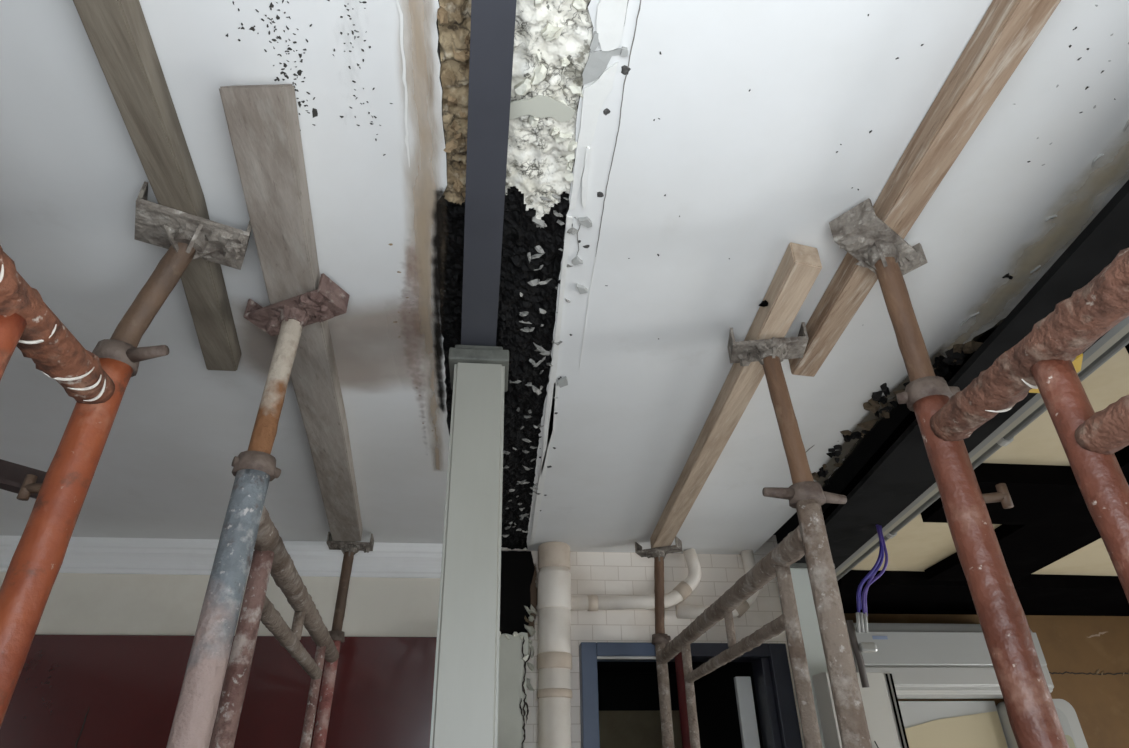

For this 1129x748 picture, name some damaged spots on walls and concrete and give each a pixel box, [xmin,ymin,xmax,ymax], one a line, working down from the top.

leakage [226,0,318,132]
leakage [333,1,381,141]
spalling [505,0,631,548]
leakage [930,120,1129,371]
flaking render [933,340,983,382]
flaking render [812,382,909,485]
leakage [816,376,910,487]